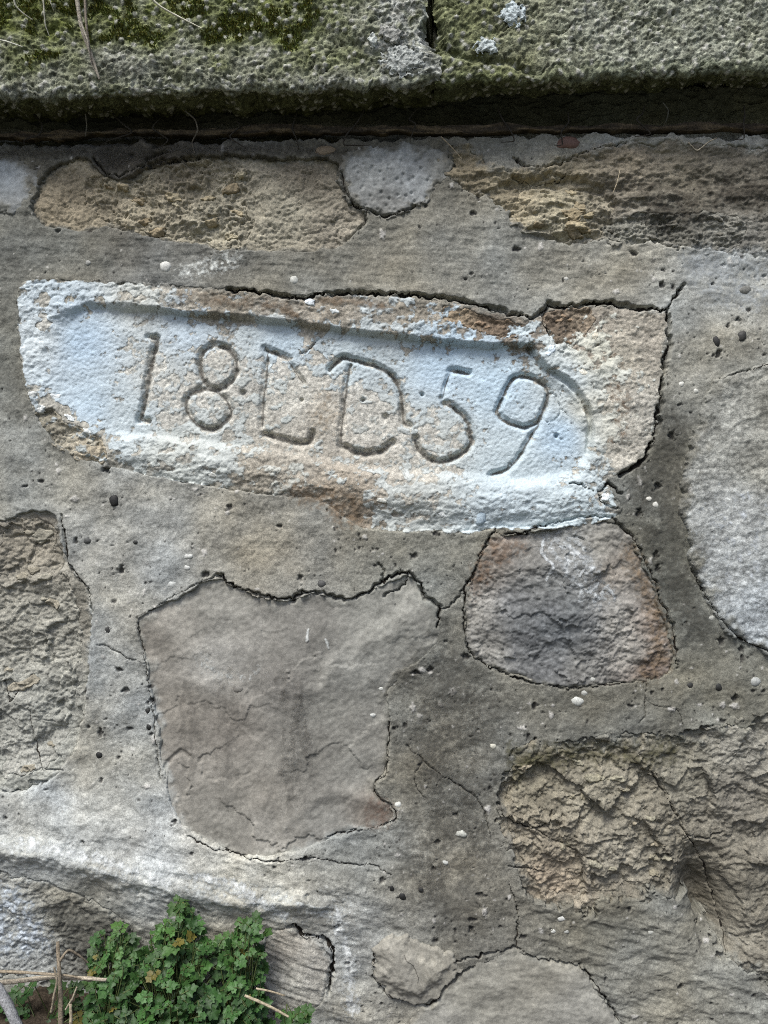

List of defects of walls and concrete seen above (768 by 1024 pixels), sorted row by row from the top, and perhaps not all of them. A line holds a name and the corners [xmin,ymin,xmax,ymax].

peeling [17,279,655,534]
crack [228,287,681,666]
crack [105,524,684,776]
crack [426,866,622,1024]
spalling [506,747,688,895]